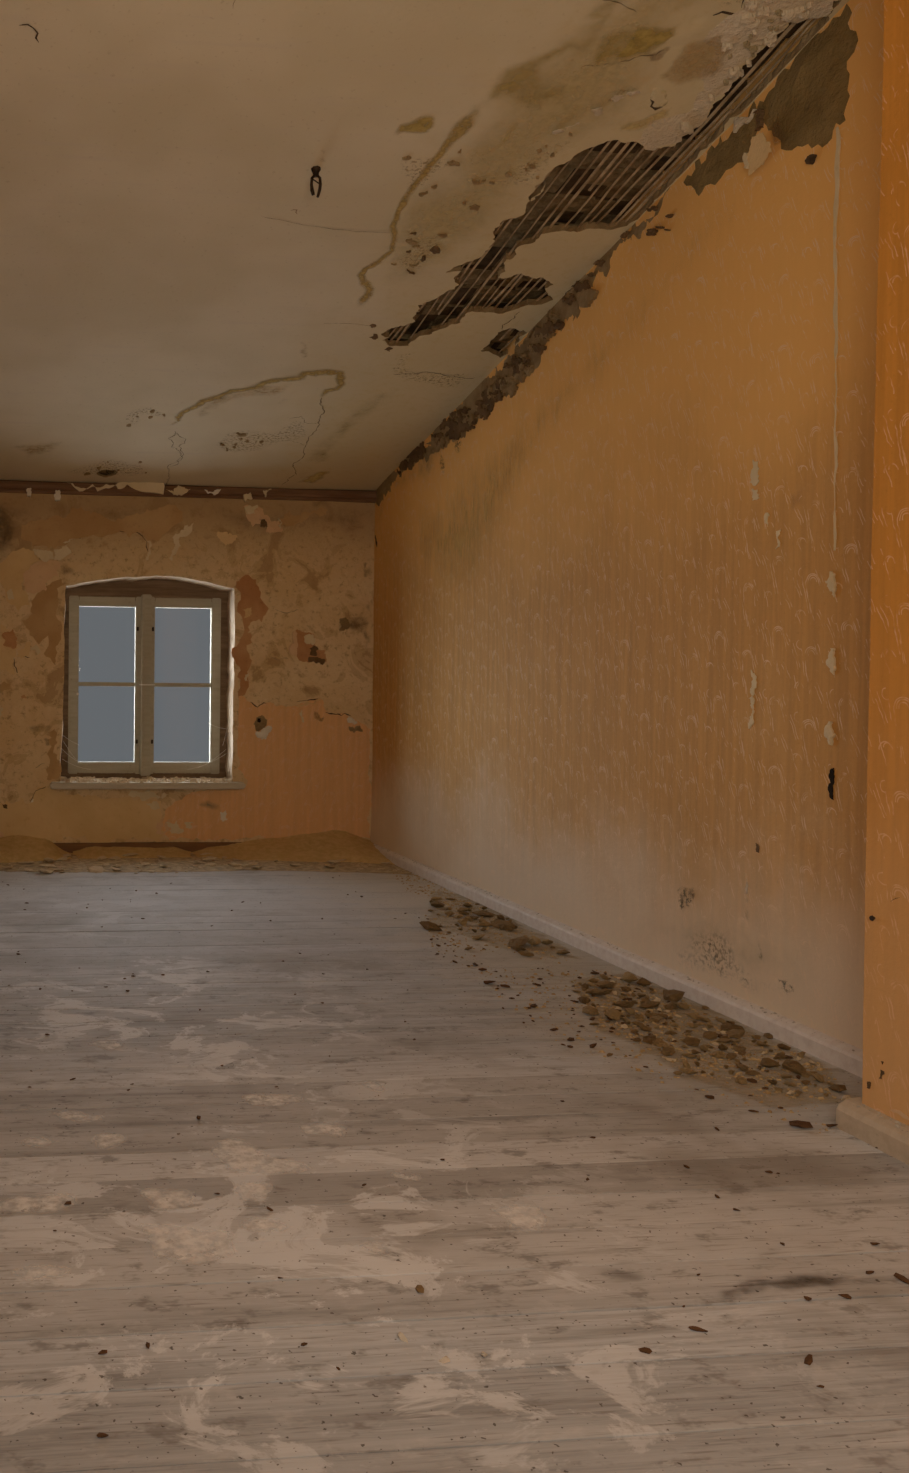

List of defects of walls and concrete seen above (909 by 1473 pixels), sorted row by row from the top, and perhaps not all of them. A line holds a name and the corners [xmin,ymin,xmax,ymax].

damp [358,26,672,302]
flaking render [369,0,858,506]
damp [176,370,344,421]
peeling [750,460,781,549]
flaking render [288,629,327,665]
flaking render [254,715,272,740]